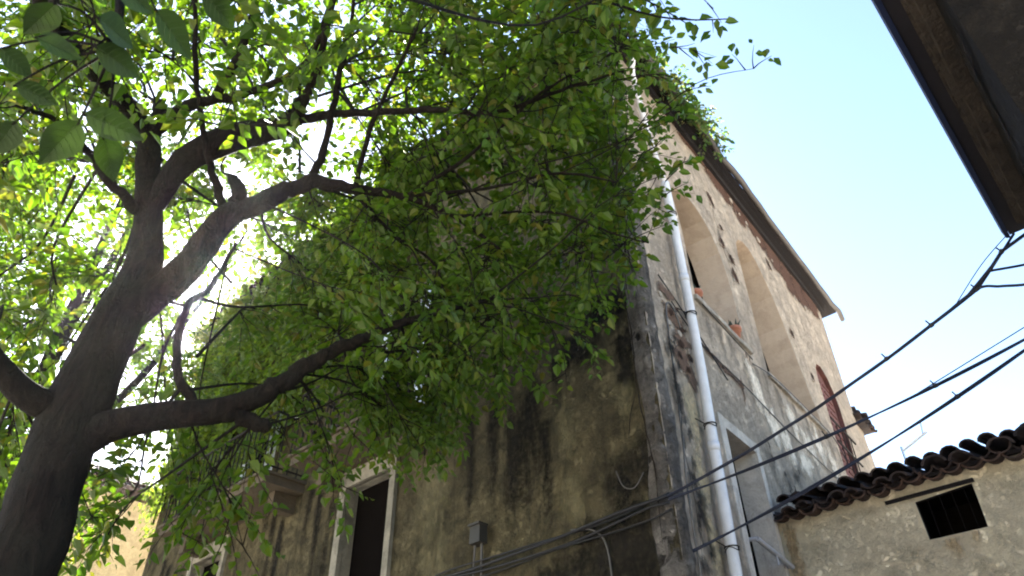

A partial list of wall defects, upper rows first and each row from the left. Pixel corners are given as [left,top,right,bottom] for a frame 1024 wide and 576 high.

damp [552,289,639,391]
damp [486,384,552,510]
damp [540,437,679,576]
spalling [657,282,743,575]